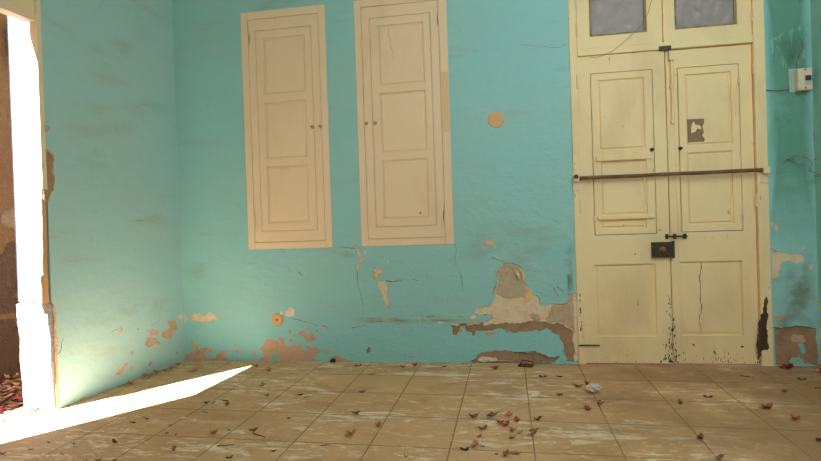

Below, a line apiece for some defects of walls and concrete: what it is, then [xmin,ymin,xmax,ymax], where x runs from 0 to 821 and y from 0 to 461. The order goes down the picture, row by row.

spalling [42,149,55,202]
spalling [1,208,15,230]
peeling [372,258,390,309]
spalling [437,239,582,363]
spalling [771,247,813,283]
spalling [137,312,220,348]
peeling [176,340,242,360]
peeling [252,307,352,362]